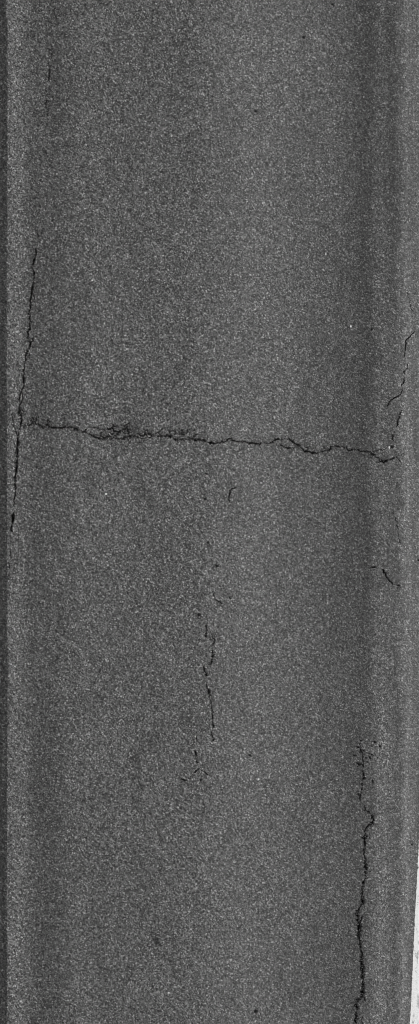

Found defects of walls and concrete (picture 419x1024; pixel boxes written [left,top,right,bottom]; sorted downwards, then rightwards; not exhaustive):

crack [8,7,415,580]
crack [181,591,231,781]
crack [349,743,375,1024]